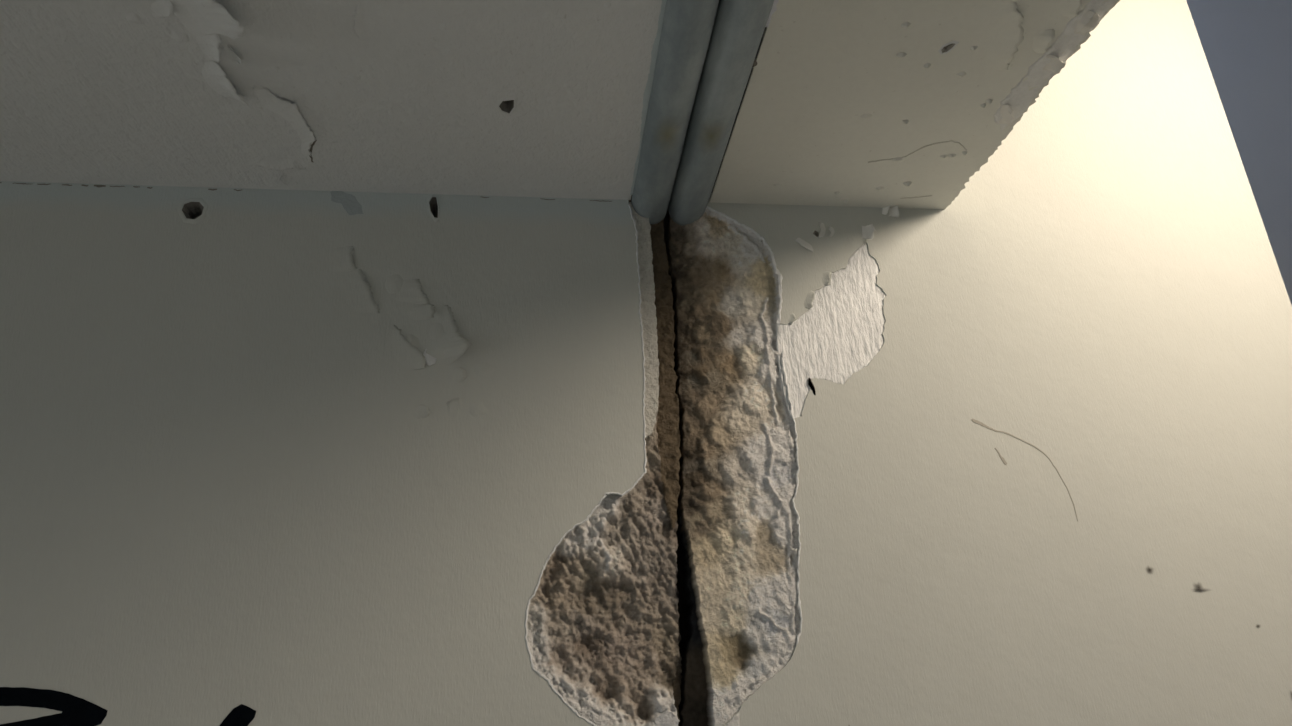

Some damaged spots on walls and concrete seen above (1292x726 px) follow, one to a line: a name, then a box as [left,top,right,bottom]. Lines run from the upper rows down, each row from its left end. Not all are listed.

peeling [151,0,316,160]
peeling [994,0,1117,132]
spalling [525,202,900,726]
crack [676,514,689,667]